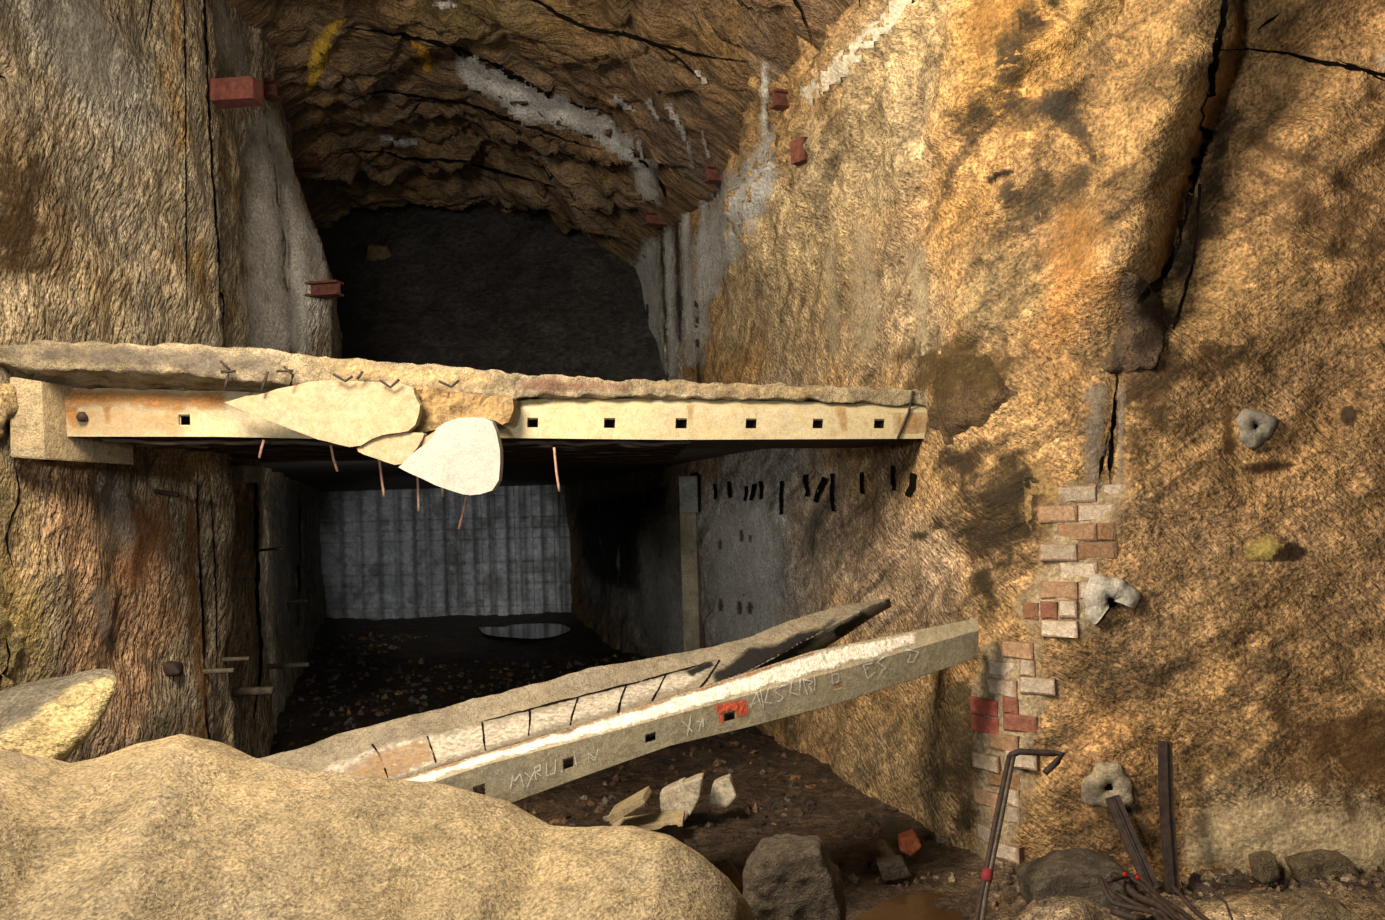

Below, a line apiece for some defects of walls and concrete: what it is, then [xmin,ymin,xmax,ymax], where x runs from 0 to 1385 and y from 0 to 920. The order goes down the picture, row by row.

damp [458,56,710,204]
crack [1137,0,1385,329]
damp [631,201,708,382]
damp [897,248,1022,397]
rust [65,389,224,428]
crack [1097,372,1118,487]
crack [5,458,57,568]
flaking render [970,469,1126,865]